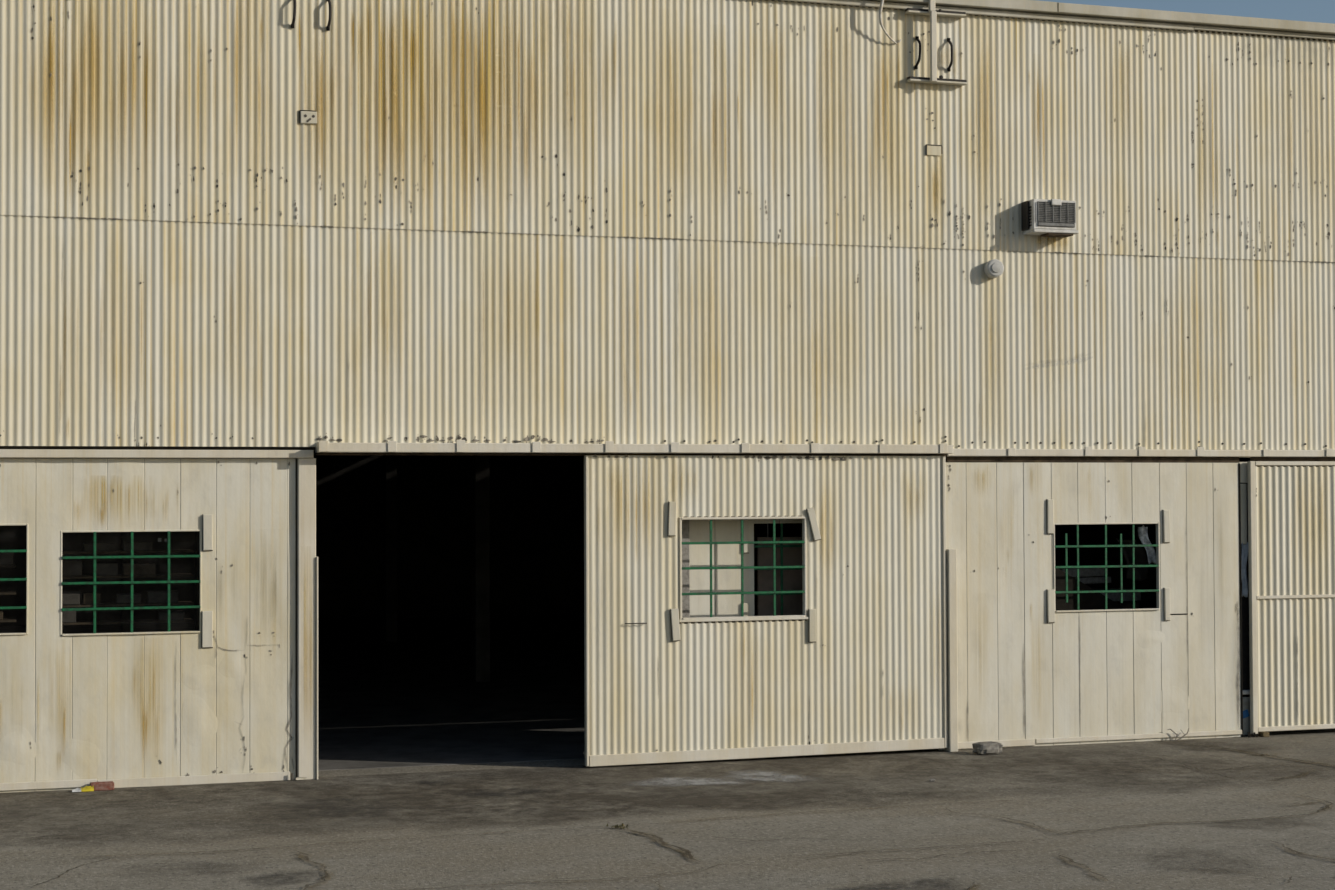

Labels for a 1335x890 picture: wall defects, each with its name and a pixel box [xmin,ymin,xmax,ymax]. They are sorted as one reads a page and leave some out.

rust [353,0,424,132]
rust [462,5,500,146]
crack [401,827,768,890]
crack [803,746,1335,883]